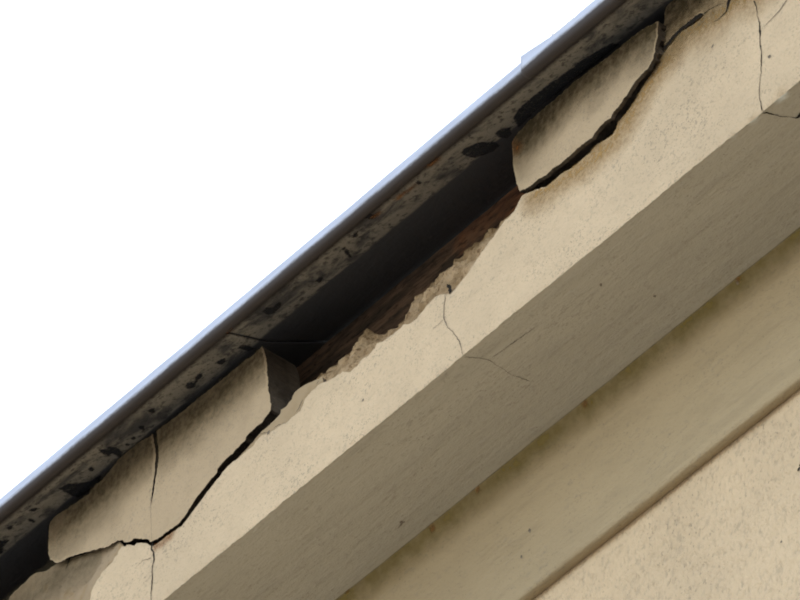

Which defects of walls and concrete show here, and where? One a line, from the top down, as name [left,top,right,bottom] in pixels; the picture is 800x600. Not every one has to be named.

crack [663,0,730,49]
crack [754,0,800,119]
peeling [461,43,619,158]
spalling [236,211,514,460]
crack [431,301,531,381]
peeling [99,437,136,457]
peeling [58,467,101,497]
spalling [9,541,126,600]
crack [138,533,155,591]